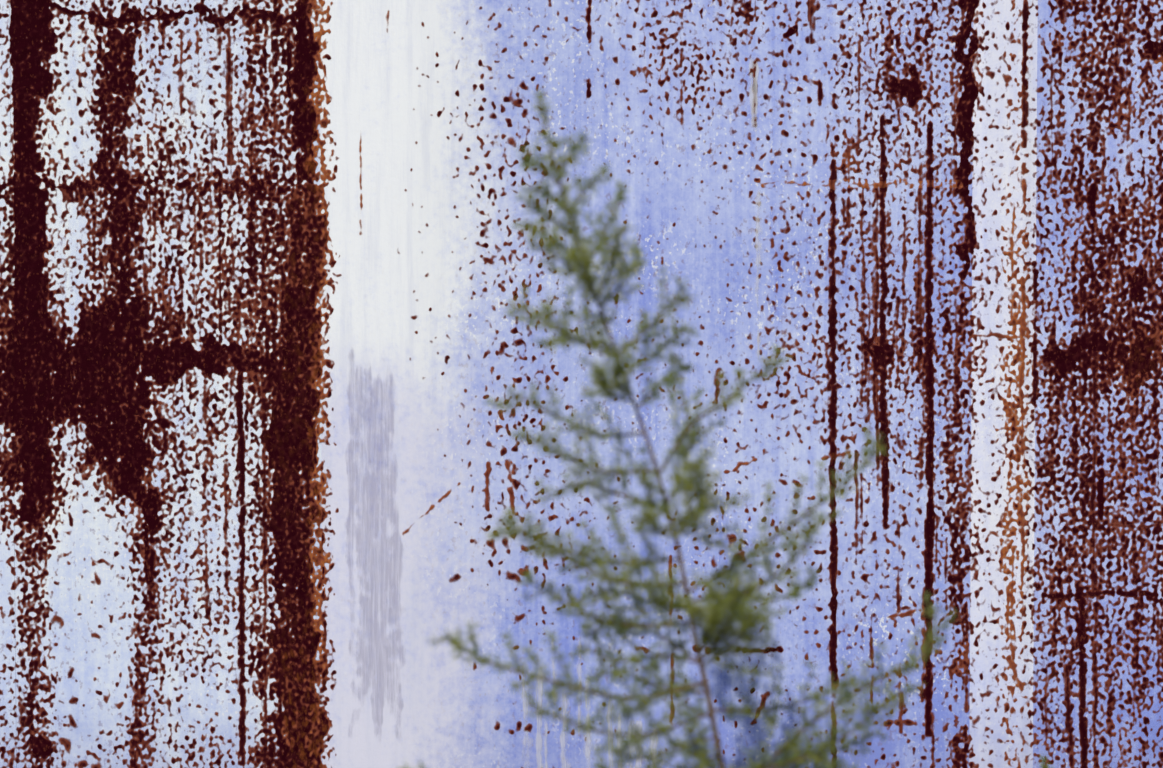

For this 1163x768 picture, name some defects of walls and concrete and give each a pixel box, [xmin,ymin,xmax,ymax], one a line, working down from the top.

corrosion [0,0,341,768]
corrosion [494,721,532,734]
corrosion [437,7,617,597]
corrosion [513,604,566,650]
corrosion [548,0,1163,768]